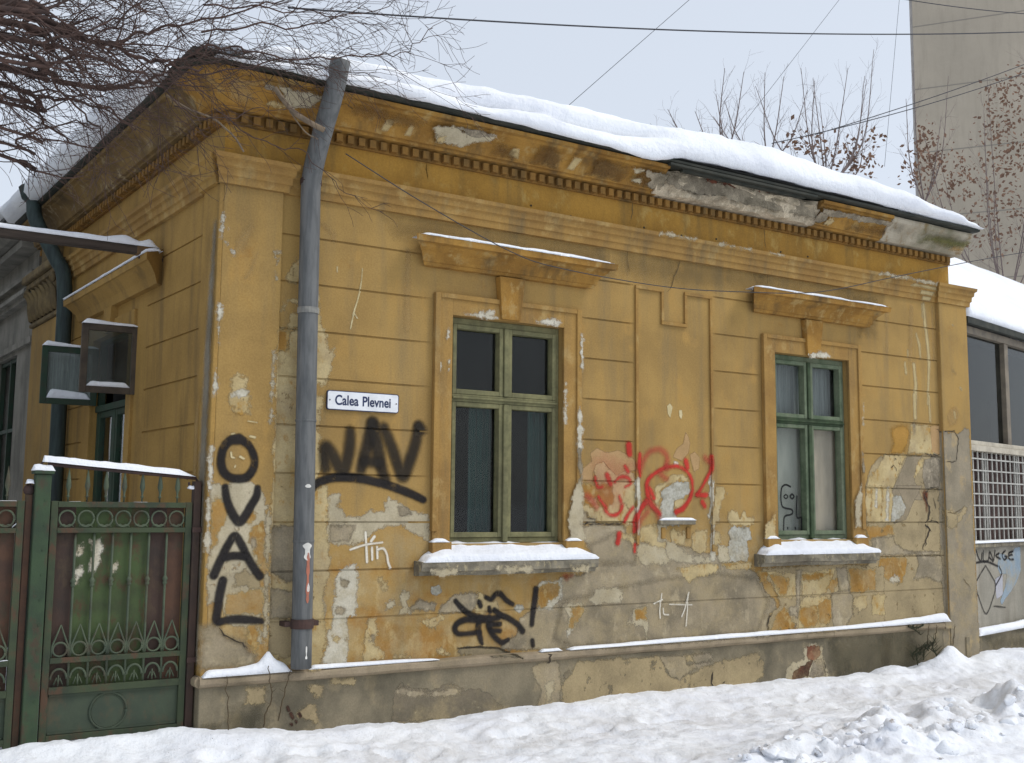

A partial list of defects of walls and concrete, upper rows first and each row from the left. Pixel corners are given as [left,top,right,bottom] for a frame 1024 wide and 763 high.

flaking render [433,125,497,148]
flaking render [633,169,893,227]
peeling [538,318,562,327]
peeling [200,299,298,669]
peeling [296,297,499,724]
flaking render [496,382,980,706]
flaking render [244,684,268,706]